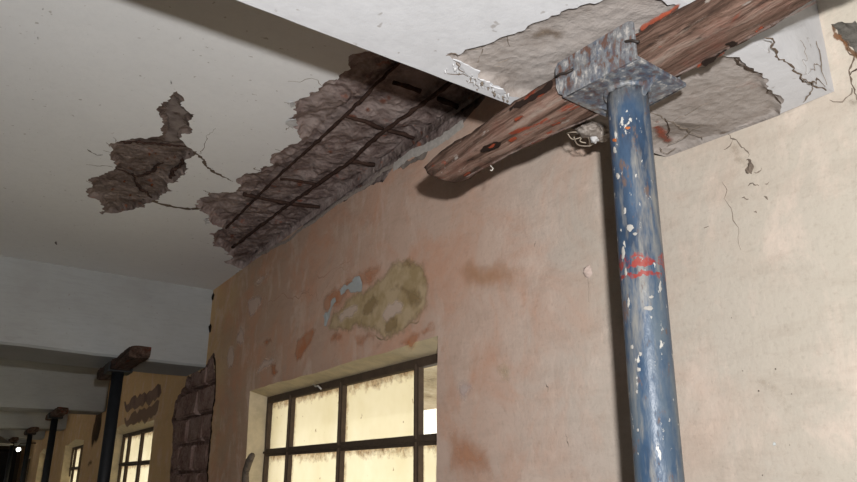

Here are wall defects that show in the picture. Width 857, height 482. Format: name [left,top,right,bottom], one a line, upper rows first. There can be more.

crack [764,37,857,103]
spalling [831,21,857,53]
spalling [86,91,197,214]
crack [193,128,231,181]
spalling [195,0,678,273]
spalling [650,55,784,174]
crack [152,200,200,210]
peeling [324,259,428,347]
peeling [124,384,161,427]
flaking render [170,353,216,482]